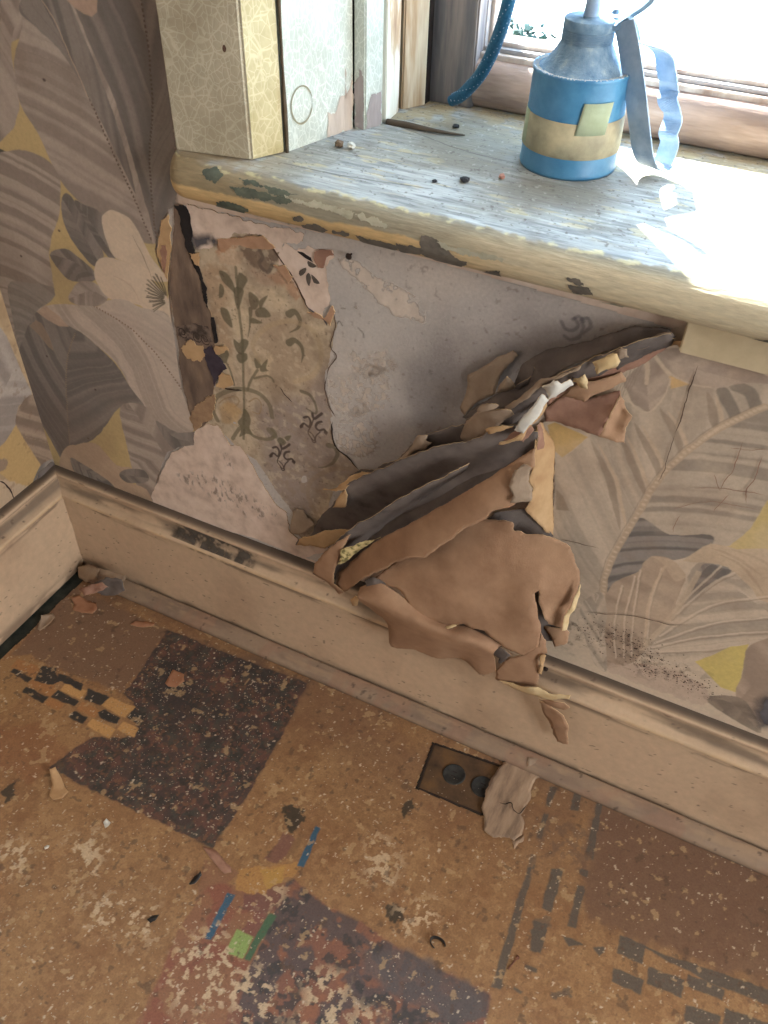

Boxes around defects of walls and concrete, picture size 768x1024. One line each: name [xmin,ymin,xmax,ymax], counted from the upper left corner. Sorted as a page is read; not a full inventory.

peeling [327,69,382,137]
flaking render [186,166,504,326]
peeling [566,277,624,308]
peeling [216,373,234,389]
crack [659,366,698,480]
flaking render [151,424,329,564]
crack [673,442,763,529]